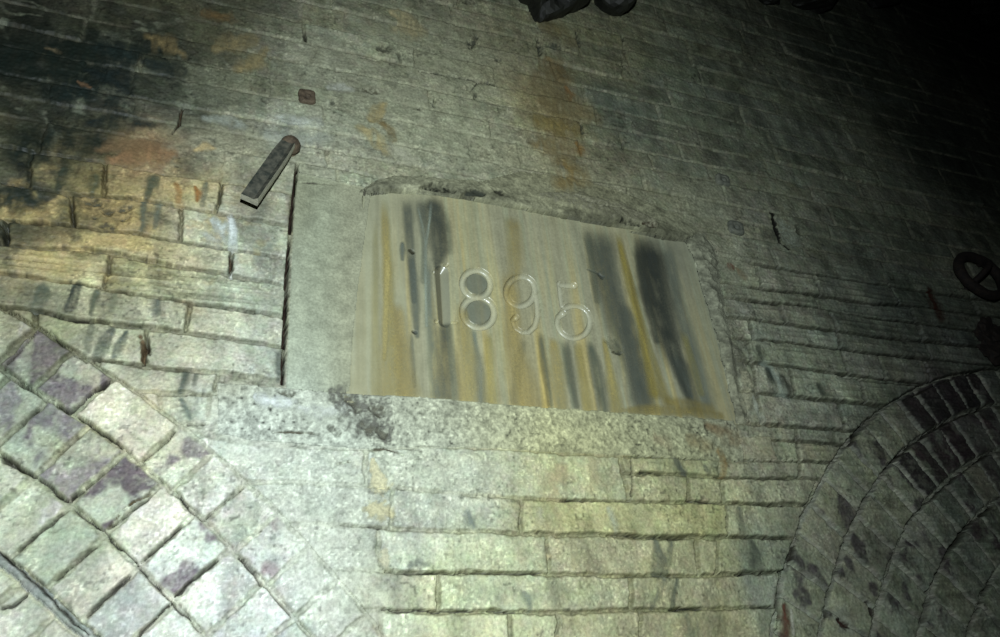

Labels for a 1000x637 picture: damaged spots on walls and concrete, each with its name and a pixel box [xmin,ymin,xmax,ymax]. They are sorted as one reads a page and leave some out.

damp [0,37,173,106]
damp [0,189,45,208]
damp [140,176,161,231]
crack [769,213,790,250]
crack [280,169,317,386]
damp [401,202,447,337]
damp [587,238,646,409]
damp [637,244,695,403]
damp [540,339,550,391]
damp [564,348,577,407]
spalling [328,387,392,443]